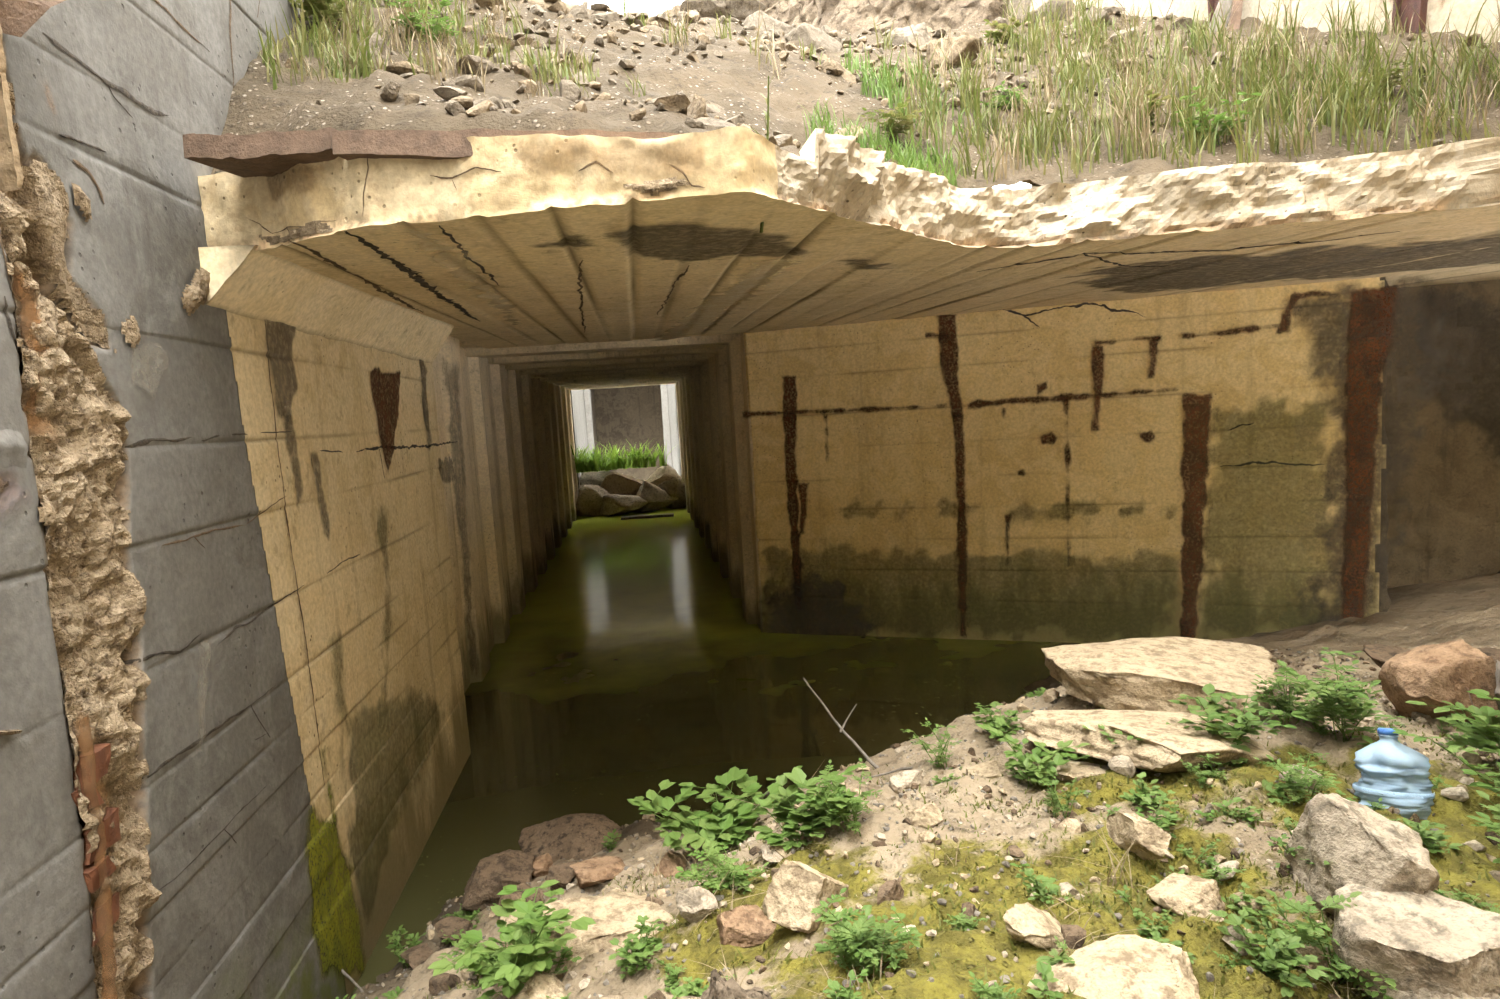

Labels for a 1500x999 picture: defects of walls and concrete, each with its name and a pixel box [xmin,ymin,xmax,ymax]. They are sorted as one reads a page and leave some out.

crack [250,158,481,322]
spalling [0,24,163,999]
corrosion [370,368,400,470]
corrosion [743,376,918,603]
corrosion [925,314,1212,638]
corrosion [1216,286,1398,619]
corrosion [71,715,118,999]